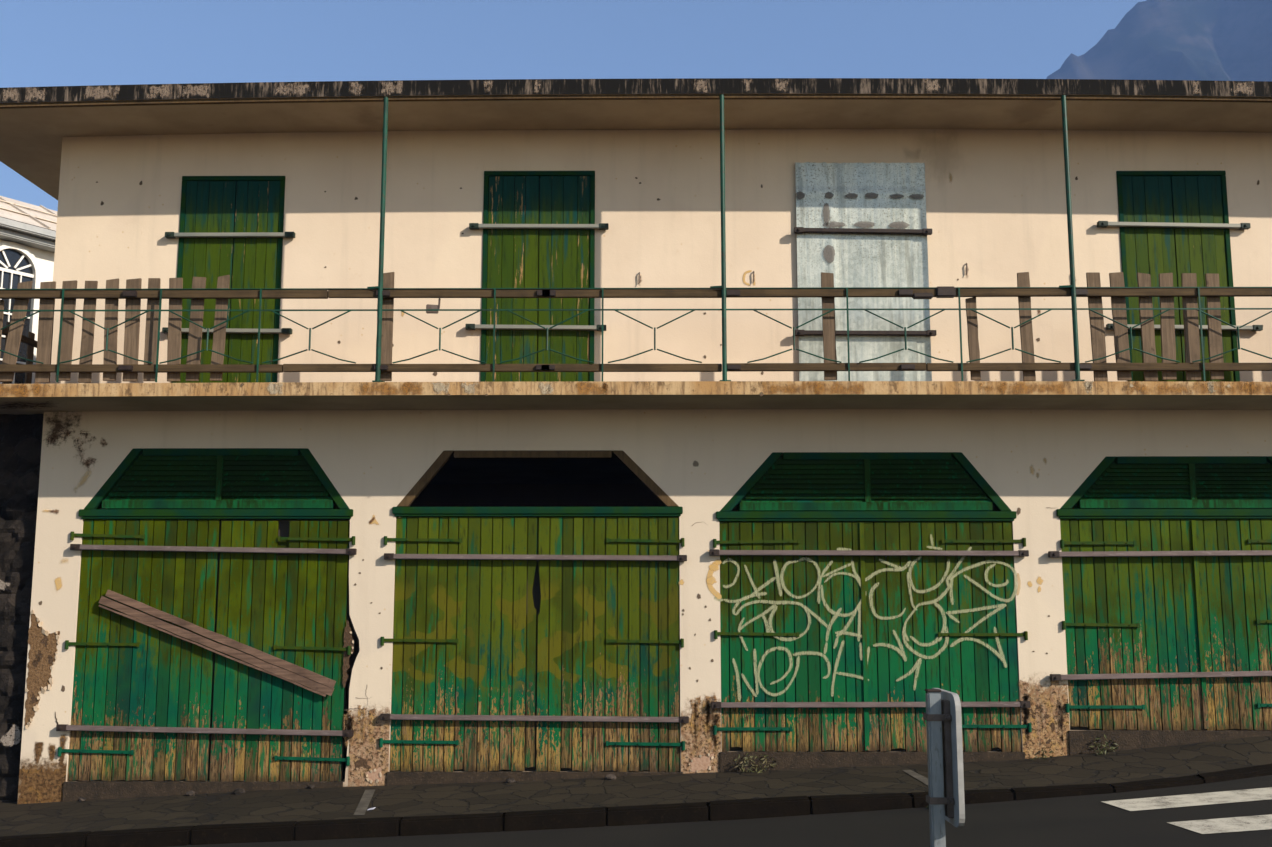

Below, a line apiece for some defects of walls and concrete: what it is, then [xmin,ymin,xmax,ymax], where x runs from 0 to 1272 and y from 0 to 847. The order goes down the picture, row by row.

flaking render [24,601,65,729]
flaking render [354,757,382,783]
flaking render [689,753,714,772]